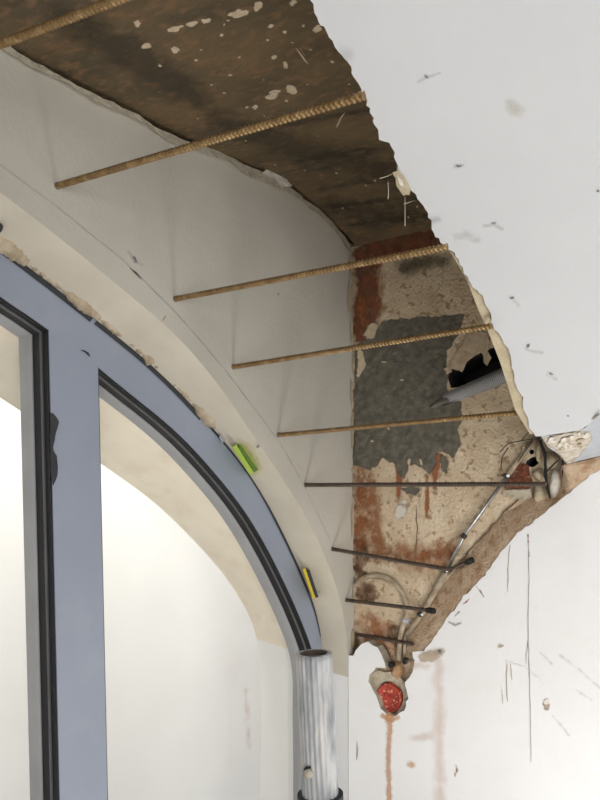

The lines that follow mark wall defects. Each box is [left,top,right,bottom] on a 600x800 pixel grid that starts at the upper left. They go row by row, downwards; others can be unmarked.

flaking render [0,0,534,449]
peeling [543,431,591,463]
spalling [304,463,547,489]
rust [425,453,440,517]
rust [353,468,456,569]
spalling [331,547,450,572]
spalling [345,578,436,614]
rust [354,615,397,658]
spalling [351,630,414,651]
crack [502,534,531,742]
rust [381,713,398,800]